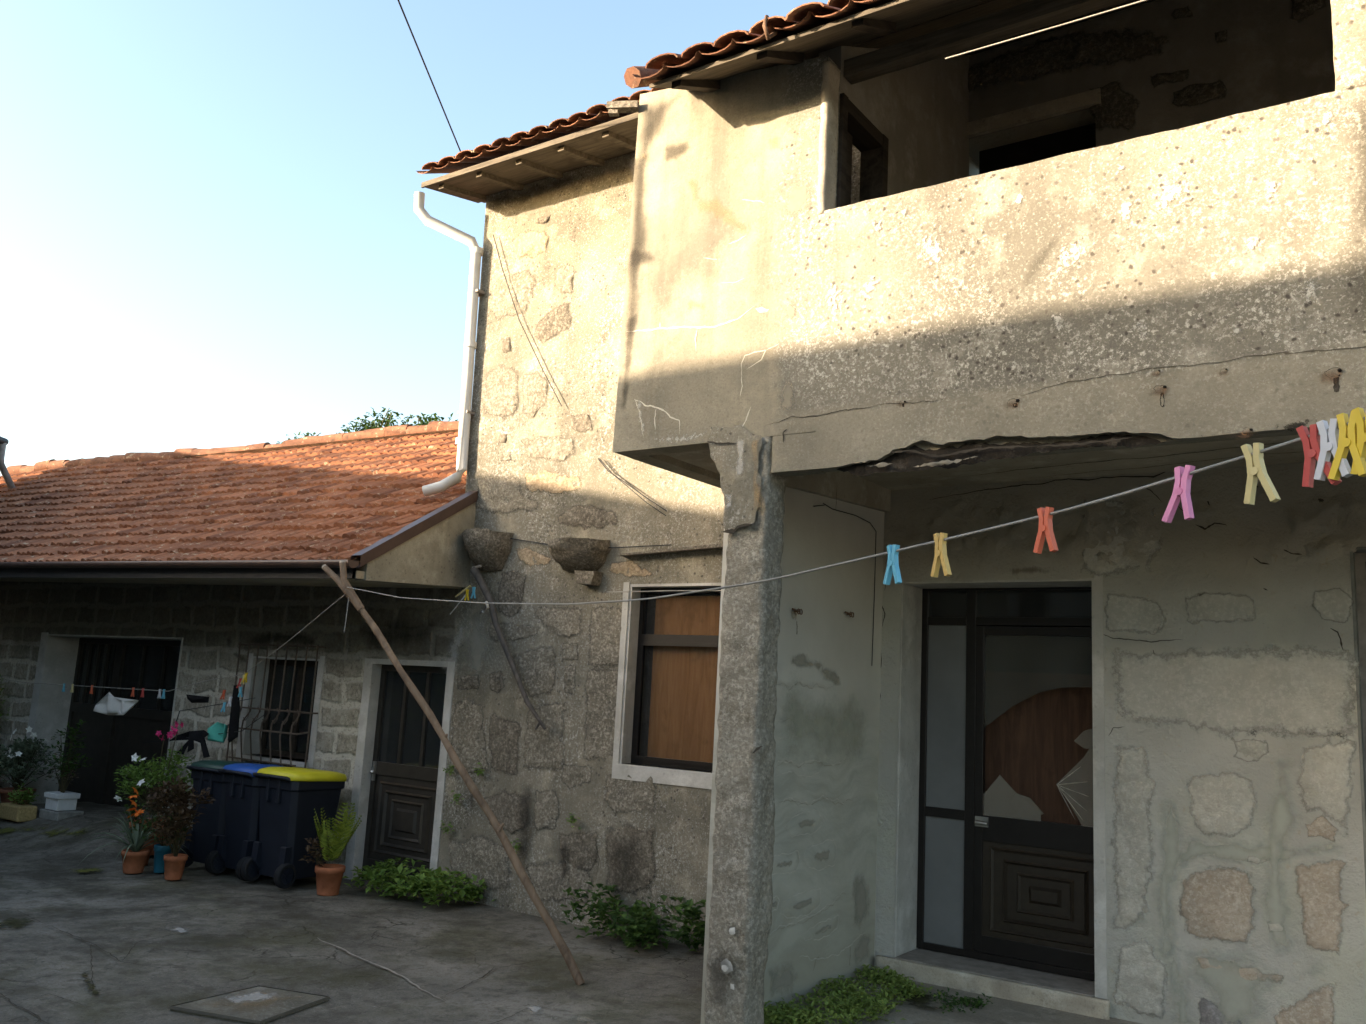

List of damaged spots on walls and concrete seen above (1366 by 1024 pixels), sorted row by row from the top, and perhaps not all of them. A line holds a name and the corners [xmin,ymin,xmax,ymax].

crack [626,235,754,345]
crack [634,344,938,442]
crack [1026,346,1366,395]
spalling [1325,367,1342,392]
spalling [837,434,1165,476]
flaking render [1114,645,1359,842]
flaking render [1295,860,1347,951]
flaking render [1199,998,1241,1024]
flaking render [1274,986,1334,1024]